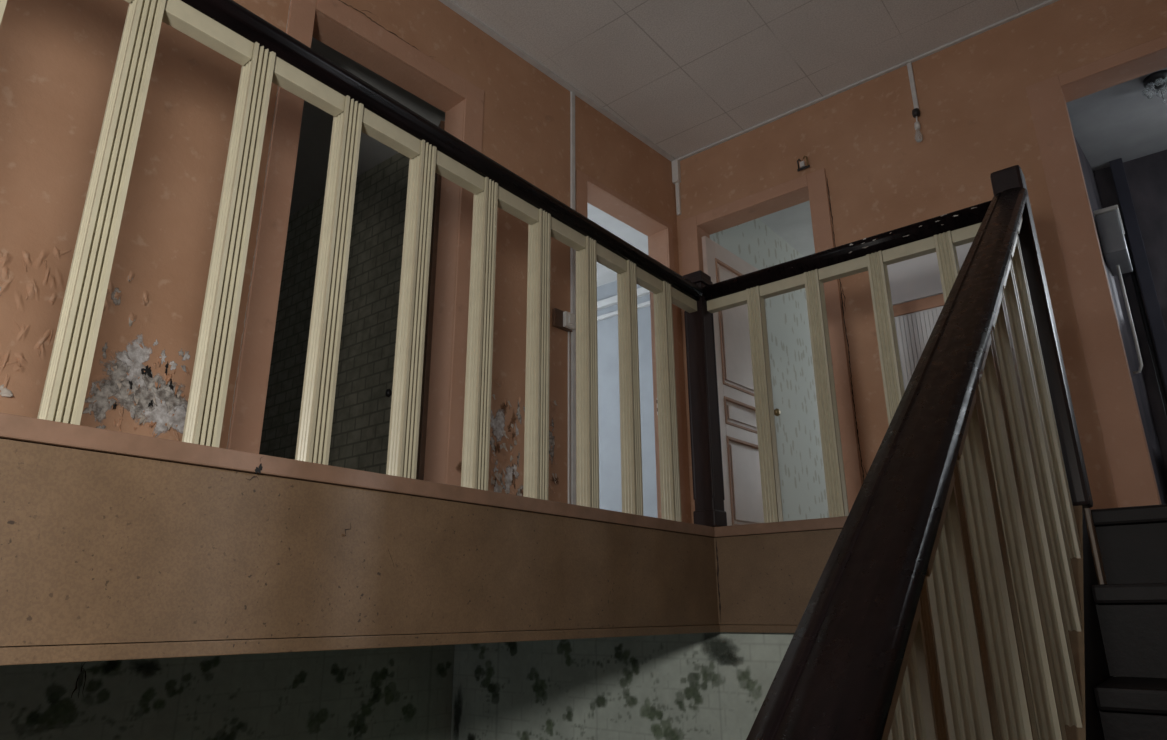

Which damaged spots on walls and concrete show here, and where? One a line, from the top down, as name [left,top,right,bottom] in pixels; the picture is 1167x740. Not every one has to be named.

flaking render [82,317,190,441]
water stain [704,636,739,666]
water stain [102,662,119,672]